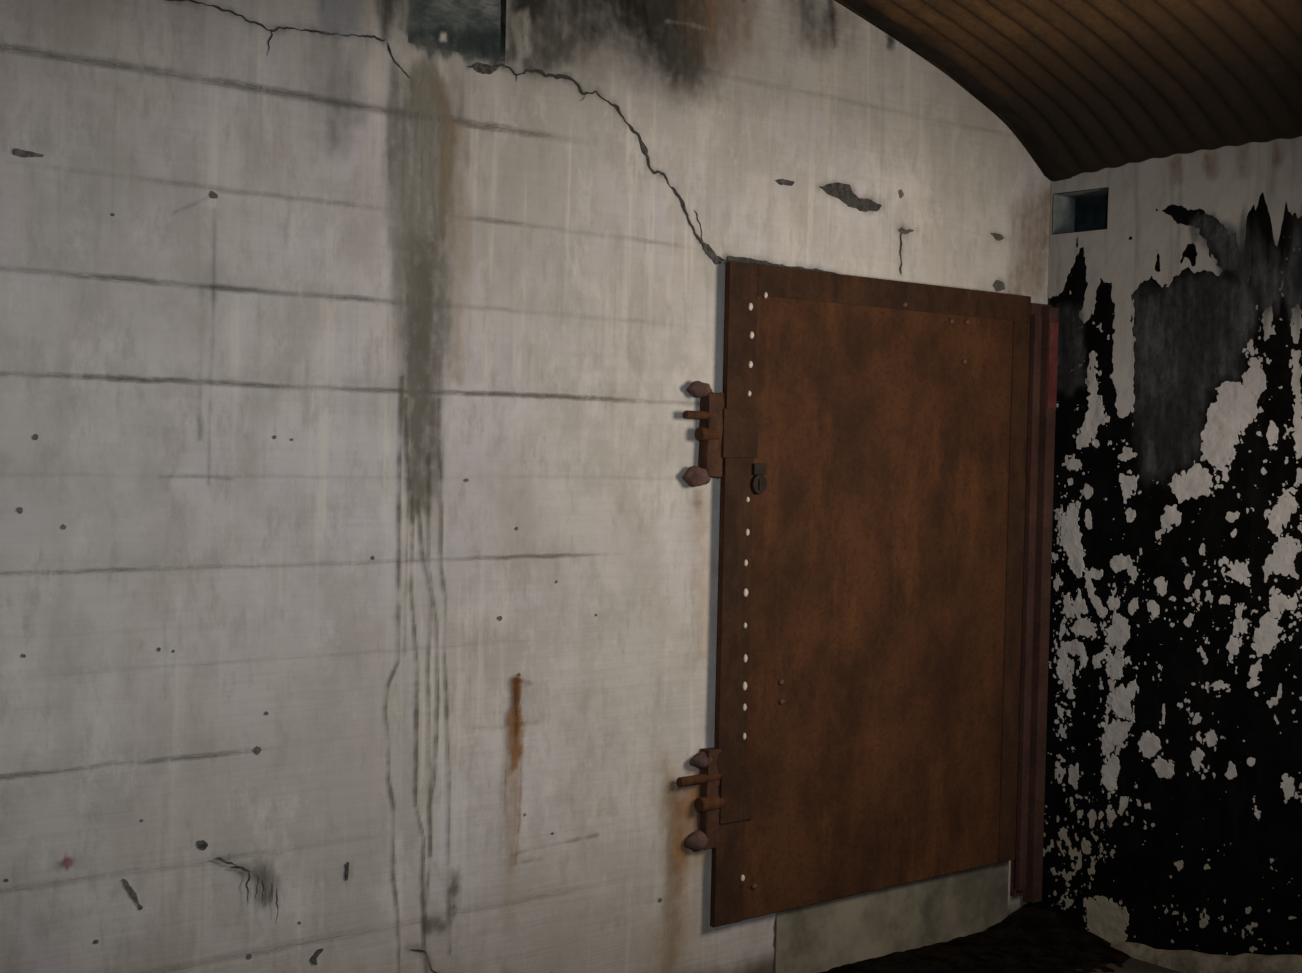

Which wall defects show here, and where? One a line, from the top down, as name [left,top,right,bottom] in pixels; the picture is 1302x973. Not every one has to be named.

crack [166,0,412,79]
water stain [512,0,739,87]
crack [466,63,725,265]
spalling [820,182,882,212]
water stain [389,63,460,638]
peeling [1043,136,1302,943]
rust [507,677,523,771]
water stain [415,654,458,973]
crack [410,949,437,973]
peeling [1154,899,1289,952]